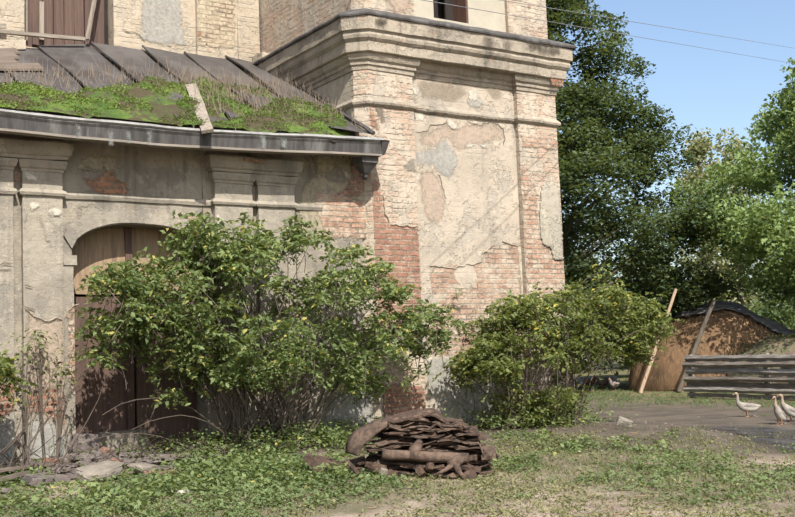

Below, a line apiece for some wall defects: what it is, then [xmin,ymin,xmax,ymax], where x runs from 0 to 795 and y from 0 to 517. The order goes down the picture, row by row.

flaking render [77,156,129,195]
flaking render [298,155,565,356]